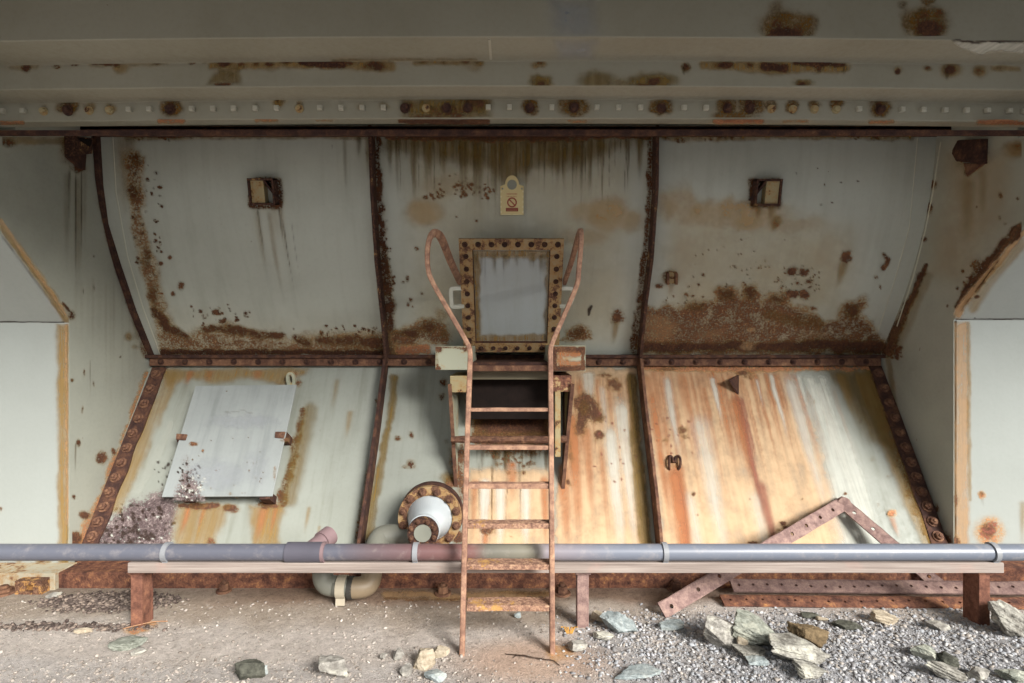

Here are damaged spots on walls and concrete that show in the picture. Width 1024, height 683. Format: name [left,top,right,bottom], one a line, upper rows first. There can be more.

corrosion [763,7,817,36]
corrosion [902,0,946,36]
corrosion [209,61,394,86]
corrosion [531,62,551,86]
corrosion [584,73,673,86]
corrosion [681,62,849,85]
corrosion [944,65,959,76]
water stain [390,138,642,179]
corrosion [123,100,929,544]
corrosion [0,220,148,544]
corrosion [945,222,1024,544]